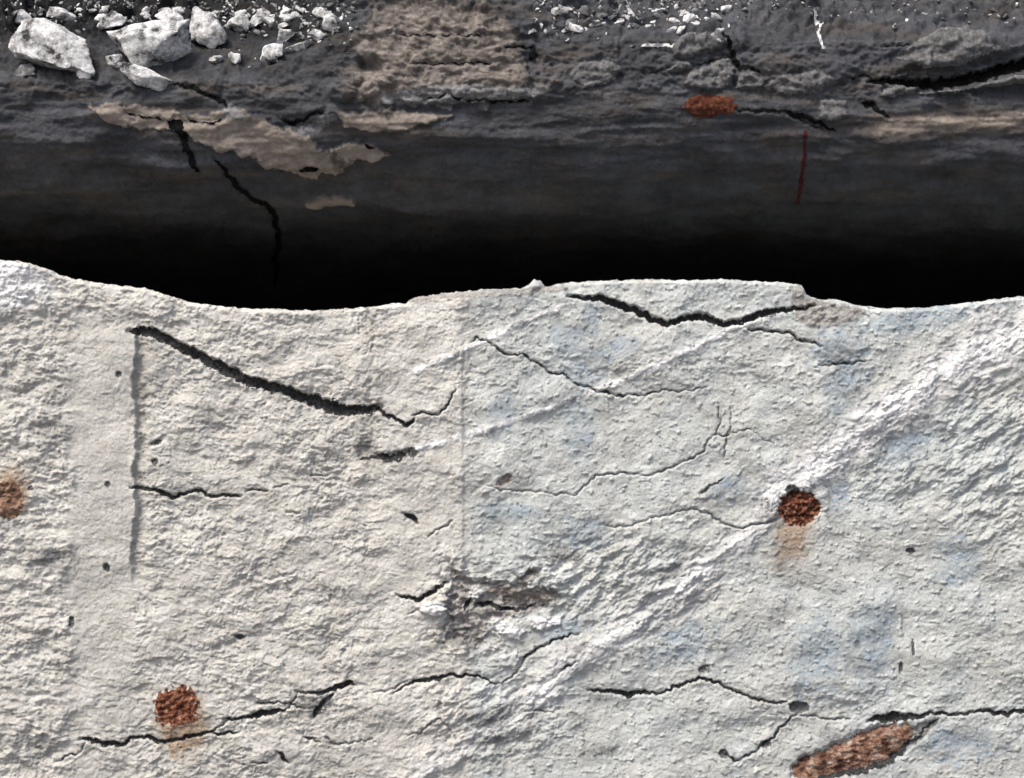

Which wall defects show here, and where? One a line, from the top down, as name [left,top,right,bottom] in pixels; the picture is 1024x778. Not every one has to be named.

spalling [89,0,622,180]
rust [679,93,737,118]
crack [850,58,1024,118]
crack [569,294,866,366]
crack [129,326,456,463]
rust [0,470,27,519]
crack [131,484,287,500]
rust [777,491,821,560]
rust [152,682,205,759]
crack [60,633,579,761]
crack [591,676,1024,778]
rust [792,722,935,778]